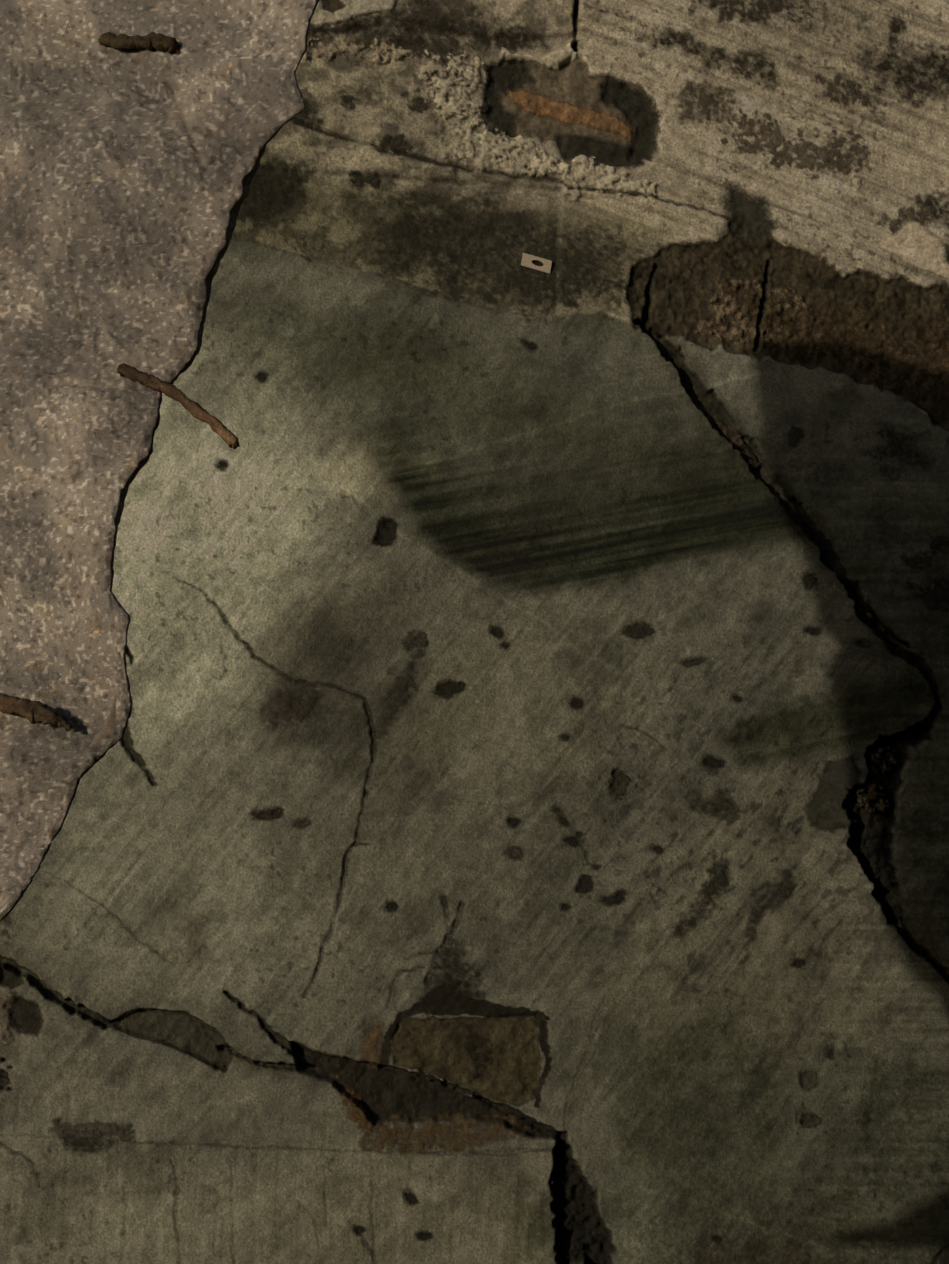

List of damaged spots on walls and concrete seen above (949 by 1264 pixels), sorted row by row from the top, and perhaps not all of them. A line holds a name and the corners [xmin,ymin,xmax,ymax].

spalling [303,0,660,200]
mould [636,27,868,180]
mould [688,0,818,26]
mould [815,16,949,109]
mould [879,193,949,234]
spalling [626,183,949,431]
crack [635,261,942,746]
crack [175,578,377,998]
crack [0,956,120,1029]
crack [218,991,318,1074]
spalling [292,986,559,1139]
crack [524,1059,616,1264]